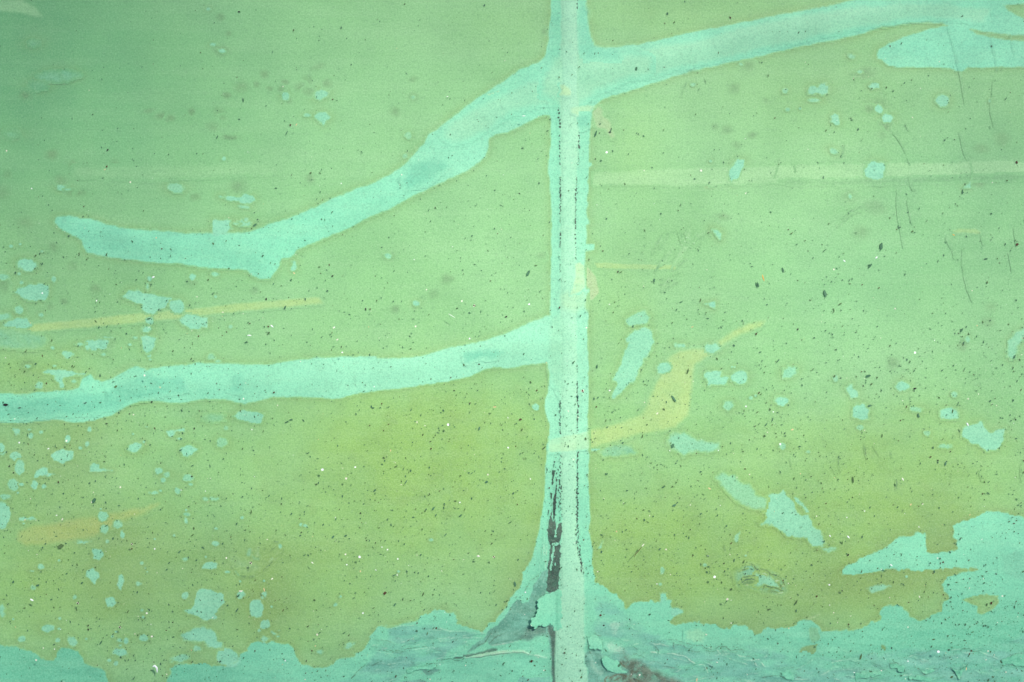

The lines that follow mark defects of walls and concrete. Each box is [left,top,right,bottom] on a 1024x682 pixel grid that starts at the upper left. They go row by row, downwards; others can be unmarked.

peeling [576,0,1024,108]
peeling [577,128,595,264]
peeling [0,0,563,682]
peeling [578,311,591,431]
spalling [609,309,673,400]
spalling [665,430,721,459]
spalling [922,391,1007,454]
peeling [578,442,1024,682]